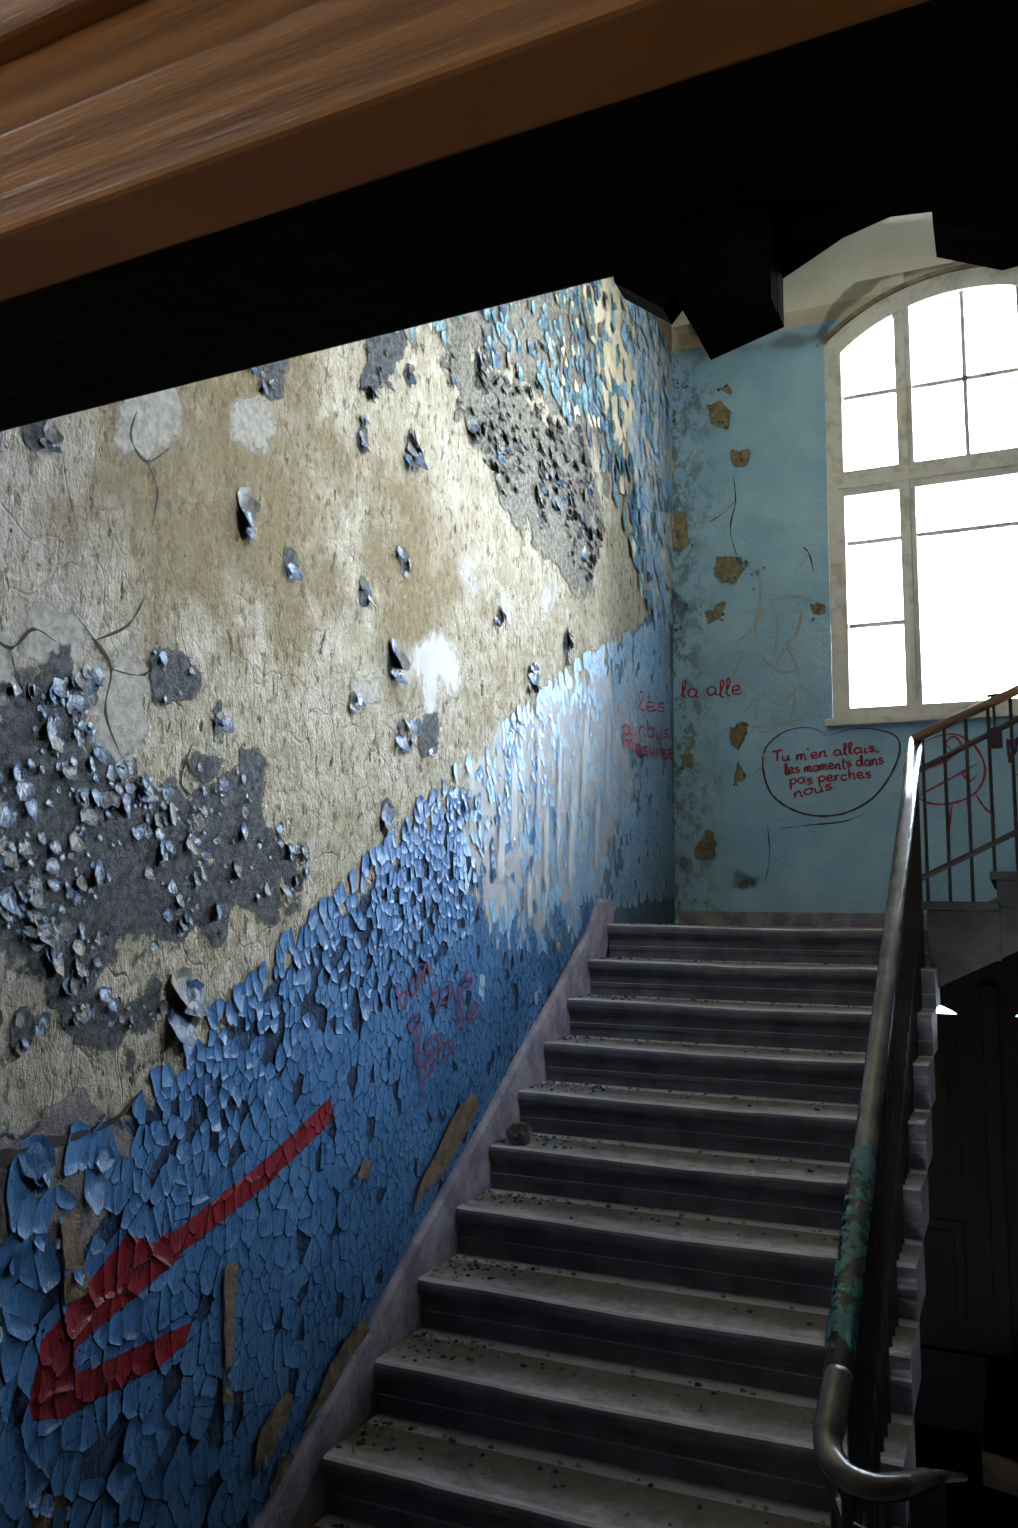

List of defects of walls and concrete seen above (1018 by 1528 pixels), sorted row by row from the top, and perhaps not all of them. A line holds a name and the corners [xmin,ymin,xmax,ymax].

peeling [707,384,732,430]
peeling [730,449,750,467]
peeling [714,556,765,591]
peeling [705,602,726,625]
peeling [810,603,825,621]
crack [0,597,152,756]
peeling [730,722,748,786]
peeling [695,830,716,860]
peeling [0,277,694,1528]